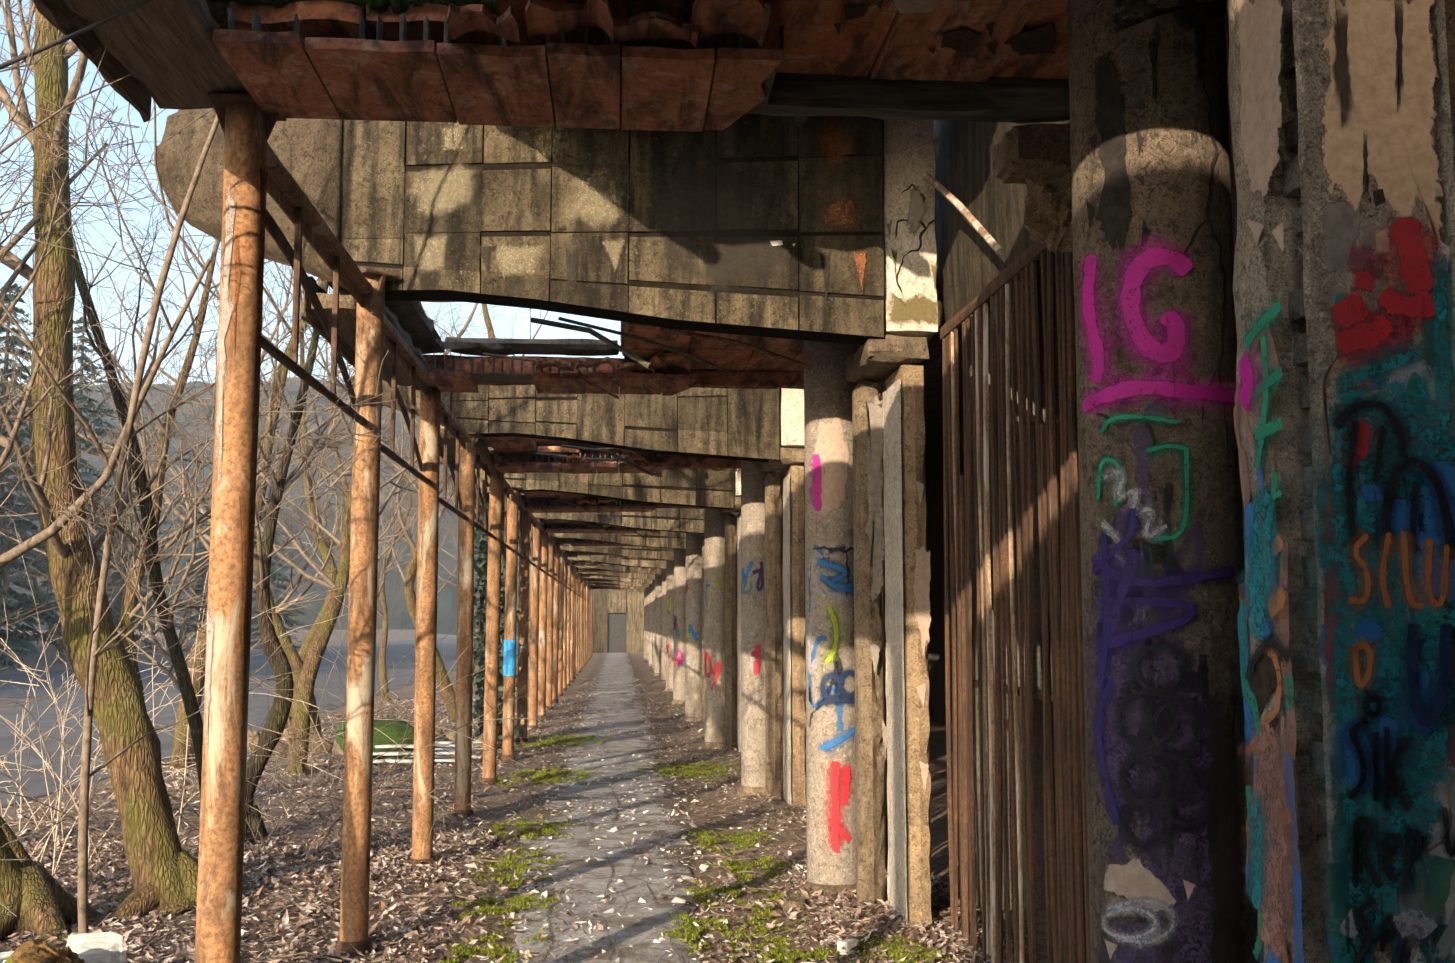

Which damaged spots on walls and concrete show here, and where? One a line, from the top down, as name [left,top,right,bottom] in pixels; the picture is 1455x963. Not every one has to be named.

rust [233,168,268,358]
damp [415,238,446,269]
damp [413,167,471,213]
damp [444,126,464,150]
damp [478,245,541,275]
damp [568,178,619,224]
damp [604,241,623,270]
damp [652,140,790,291]
crack [895,183,937,293]
spalling [1023,50,1151,254]
flaking render [1319,0,1450,273]
rust [239,509,250,658]